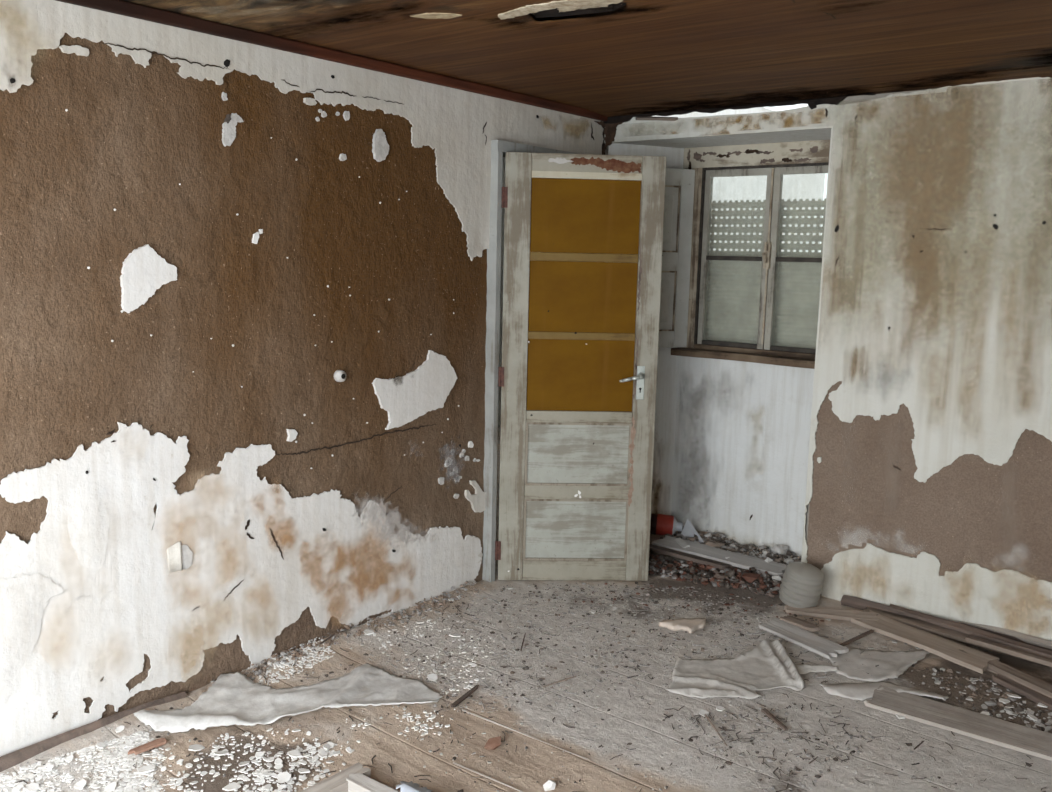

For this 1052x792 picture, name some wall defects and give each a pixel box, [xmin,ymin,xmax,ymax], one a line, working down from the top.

peeling [687,146,818,169]
spalling [0,33,487,582]
spalling [806,381,1052,582]